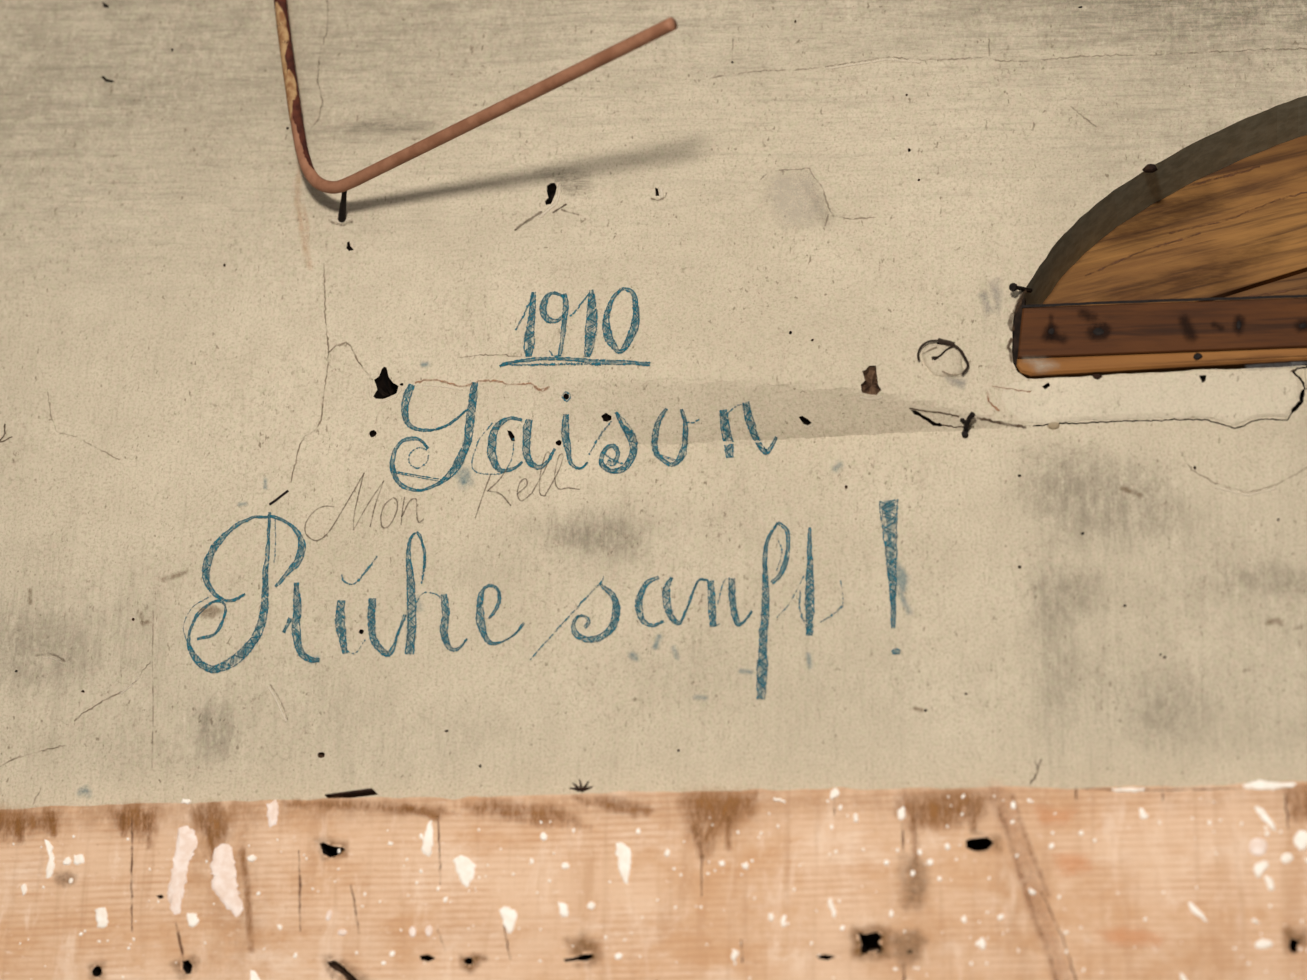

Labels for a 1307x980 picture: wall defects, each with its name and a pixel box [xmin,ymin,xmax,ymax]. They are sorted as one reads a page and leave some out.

crack [909,292,1307,429]
water stain [0,812,55,836]
water stain [690,794,750,856]
water stain [905,795,981,829]